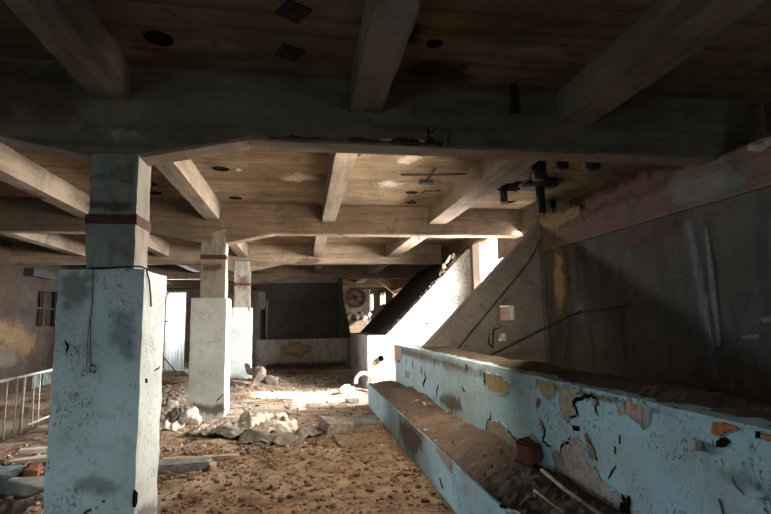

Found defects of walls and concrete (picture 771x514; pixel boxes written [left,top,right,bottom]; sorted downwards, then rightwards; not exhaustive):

peeling [484,371,512,397]
peeling [538,378,598,423]
crack [570,394,599,418]
peeling [617,397,652,430]
crack [540,420,570,452]
flaking render [711,422,739,448]
peeling [552,434,631,514]